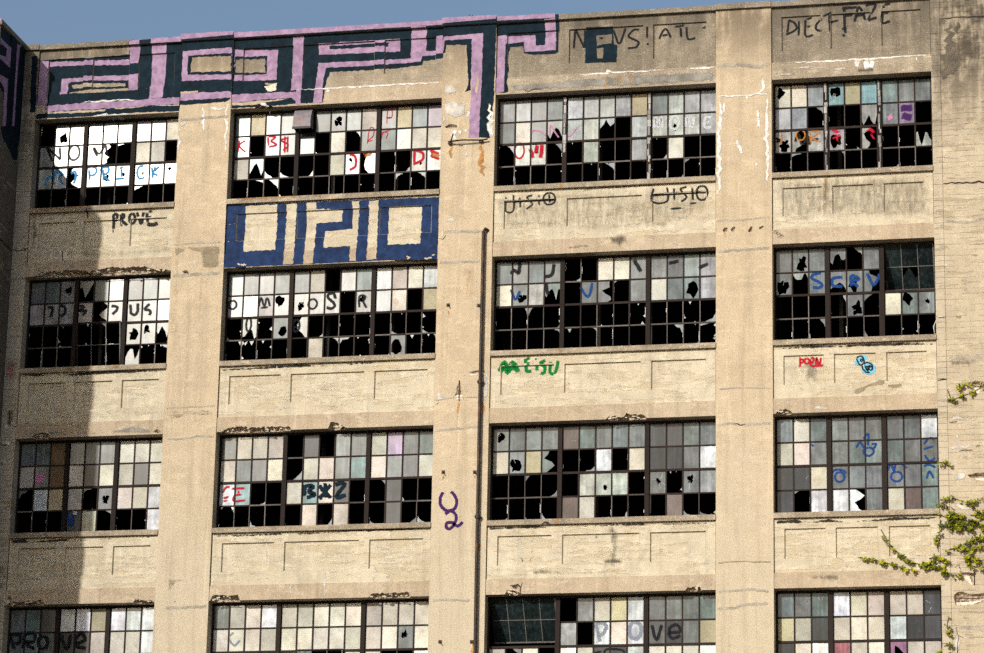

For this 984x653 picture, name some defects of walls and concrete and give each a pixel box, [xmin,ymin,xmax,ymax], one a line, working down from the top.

corrosion [478,144,486,175]
crack [943,178,984,186]
spalling [954,565,984,619]